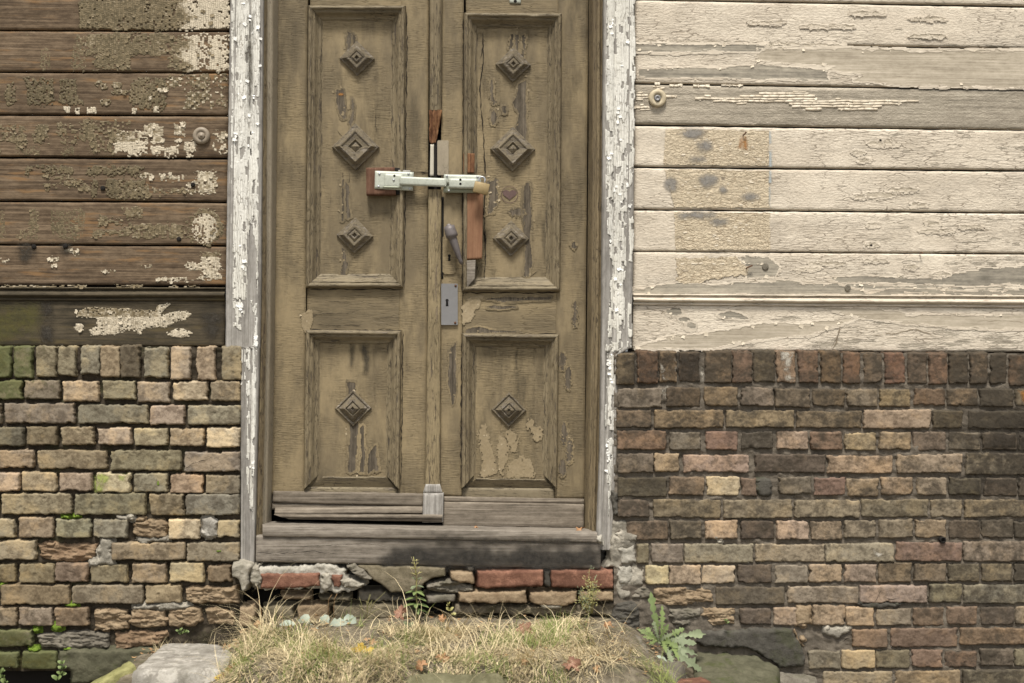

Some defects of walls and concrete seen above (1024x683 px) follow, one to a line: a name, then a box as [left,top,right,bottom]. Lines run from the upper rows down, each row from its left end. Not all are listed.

peeling [0,0,262,516]
peeling [476,419,544,479]
leakage [700,175,726,192]
peeling [604,0,1024,517]